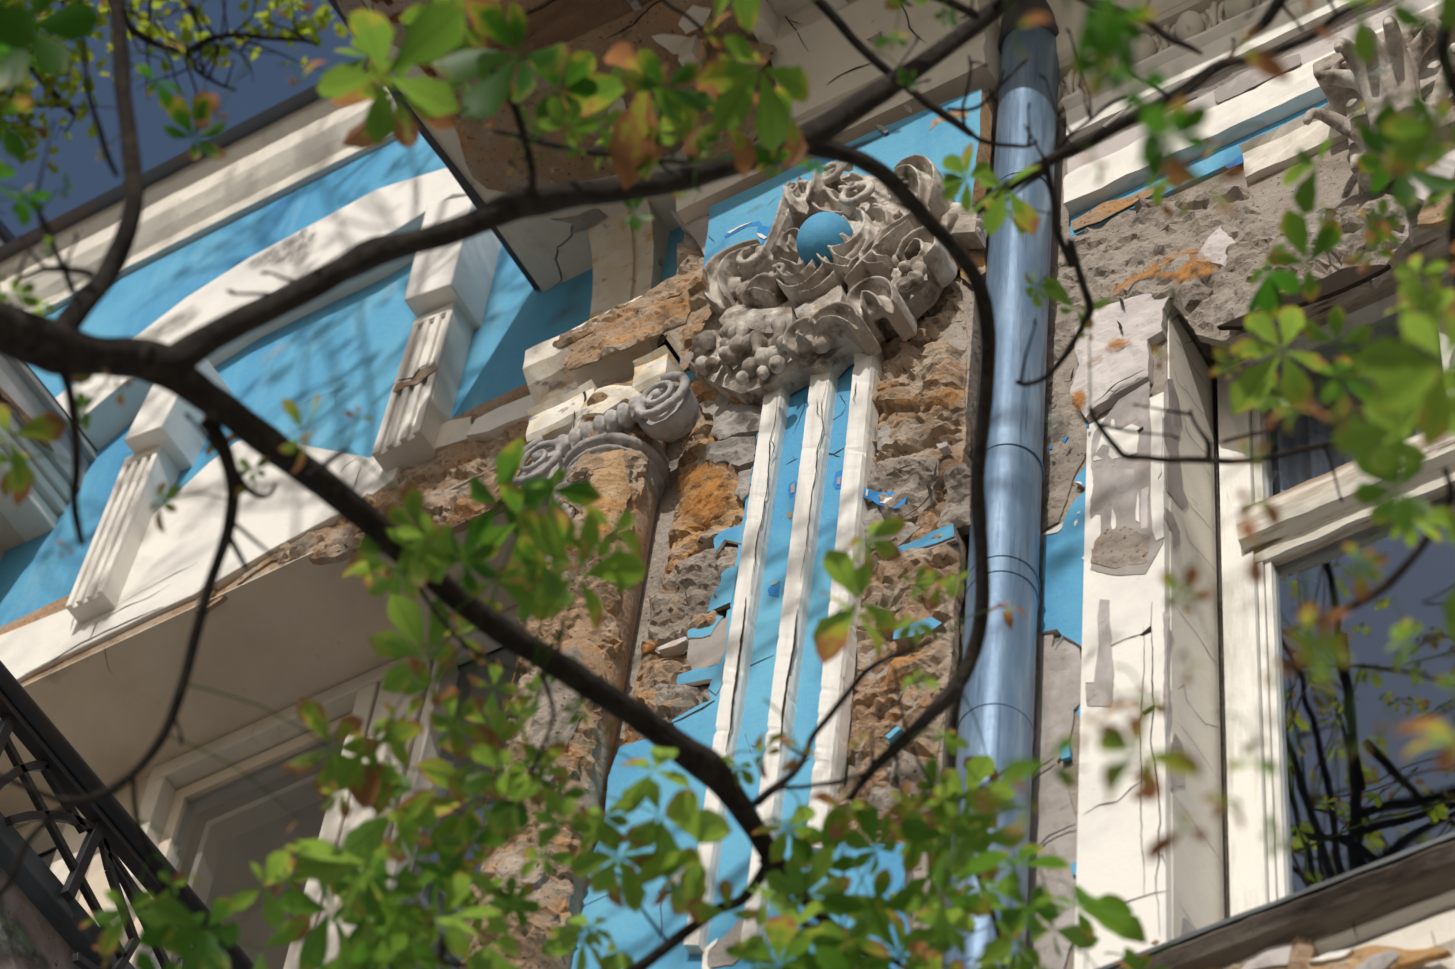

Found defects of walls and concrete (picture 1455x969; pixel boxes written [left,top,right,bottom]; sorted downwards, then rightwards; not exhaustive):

spalling [371,0,434,49]
spalling [432,0,777,192]
spalling [929,111,968,131]
crack [551,220,573,289]
spalling [551,209,772,725]
peeling [787,480,797,520]
peeling [833,470,843,490]
crack [672,382,857,760]
peeling [767,581,781,598]
spalling [837,245,988,844]
spalling [1025,154,1453,969]
spalling [620,725,645,746]